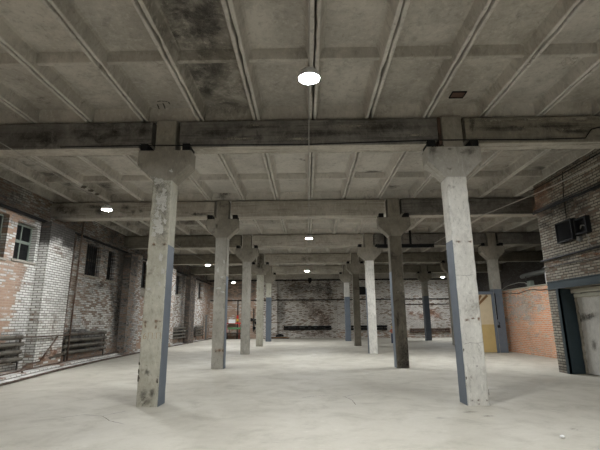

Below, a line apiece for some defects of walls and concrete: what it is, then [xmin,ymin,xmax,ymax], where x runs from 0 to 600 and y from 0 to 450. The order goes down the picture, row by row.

peeling [150,176,167,237]